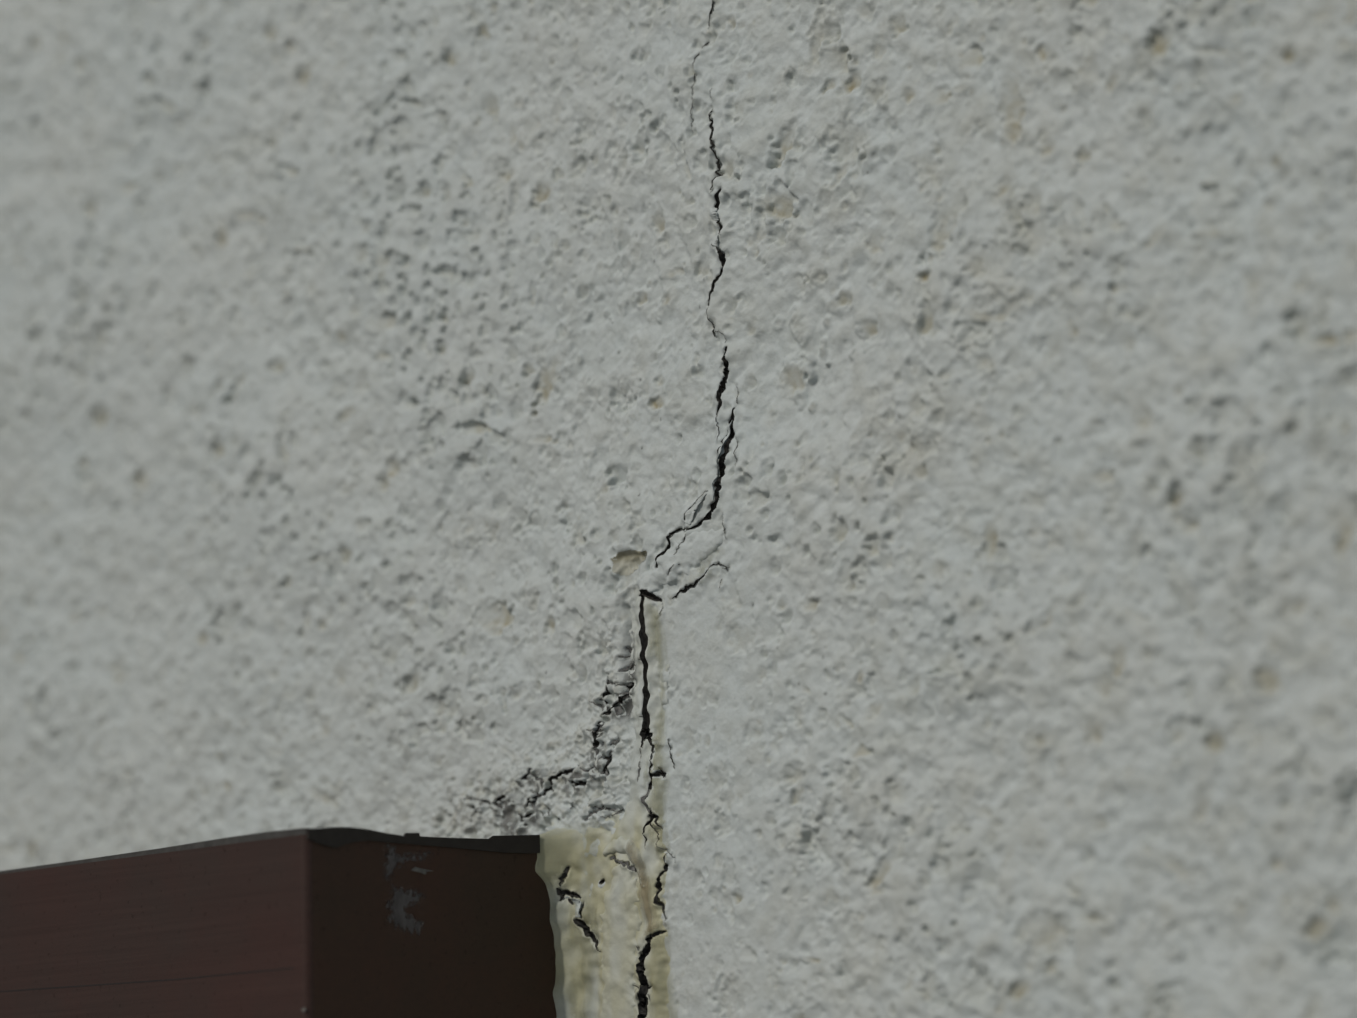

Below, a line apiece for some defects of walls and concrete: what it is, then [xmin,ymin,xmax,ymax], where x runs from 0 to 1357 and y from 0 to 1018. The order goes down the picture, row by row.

crack [556,866,601,952]
crack [610,0,738,1018]